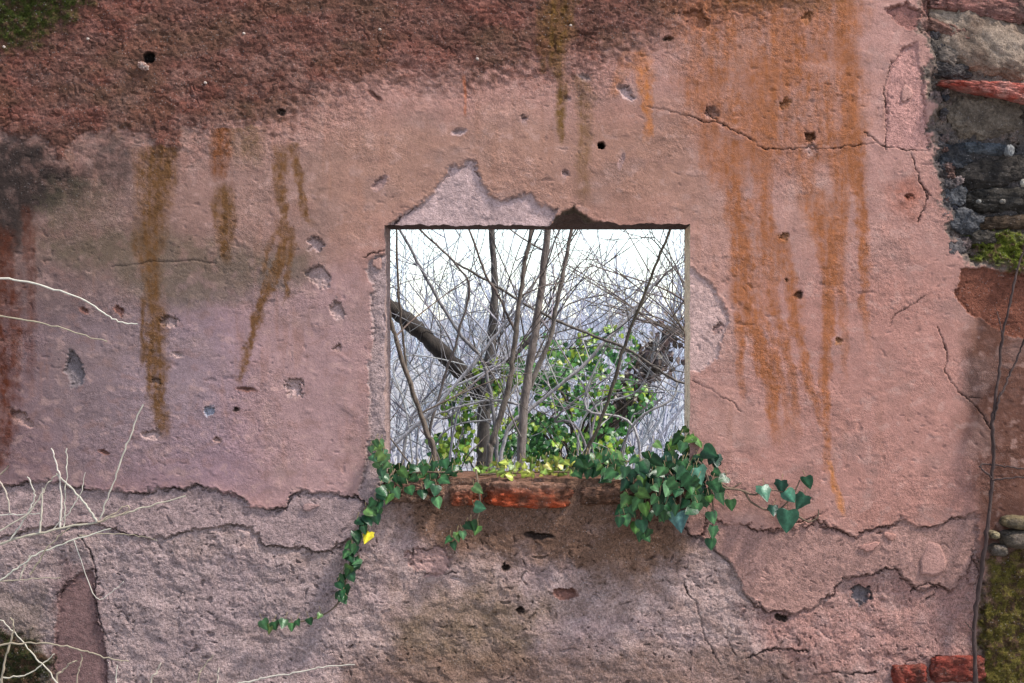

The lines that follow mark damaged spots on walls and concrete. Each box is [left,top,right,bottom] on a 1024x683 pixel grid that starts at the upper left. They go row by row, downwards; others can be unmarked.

damp [0,123,328,447]
flaking render [387,158,604,227]
damp [533,0,602,210]
corrosion [606,0,935,520]
crack [646,59,932,223]
flaking render [883,0,1024,340]
crack [937,326,991,430]
flaking render [0,252,982,683]
crack [55,534,109,642]
crack [411,546,460,577]
crack [683,579,878,676]
crack [910,581,957,603]